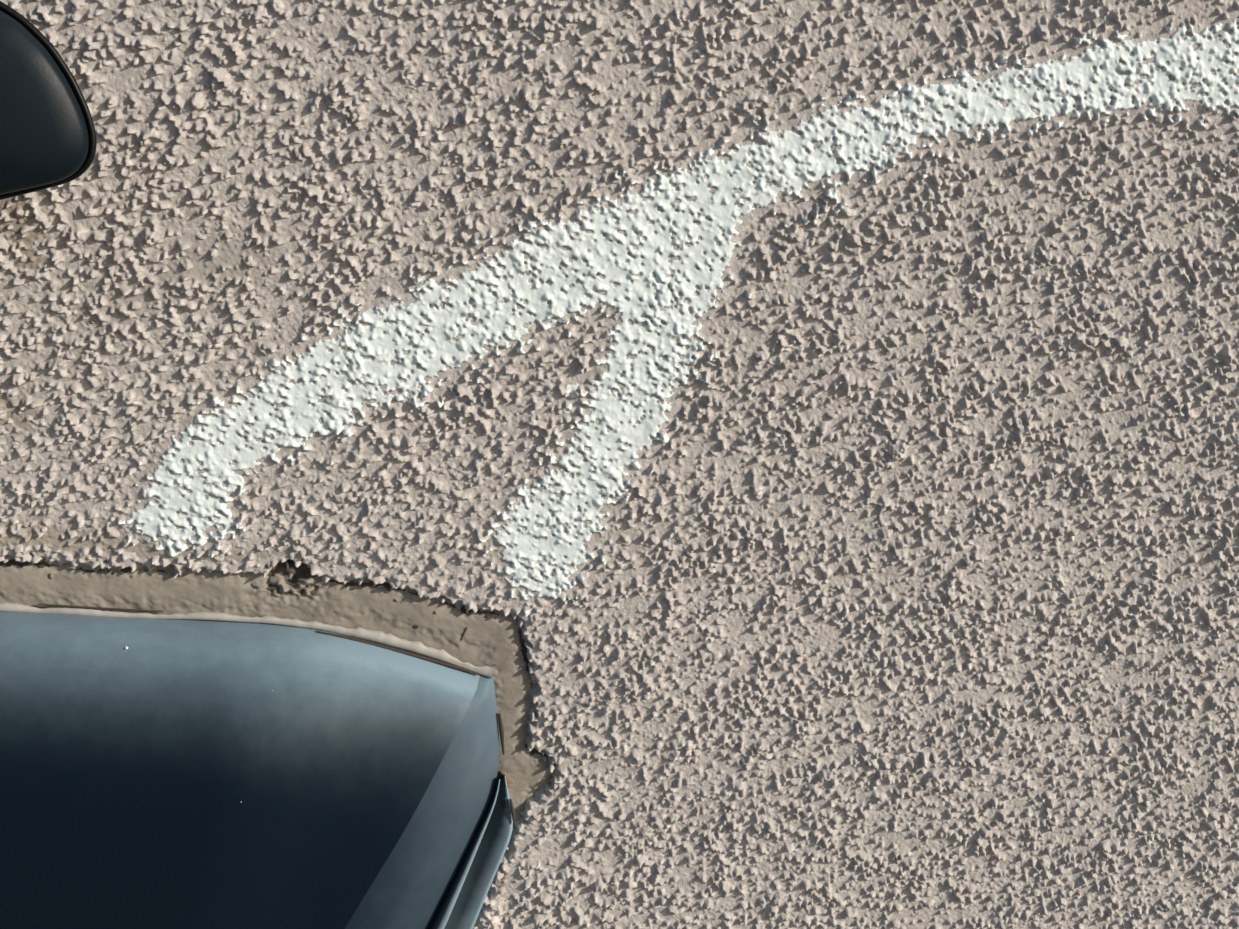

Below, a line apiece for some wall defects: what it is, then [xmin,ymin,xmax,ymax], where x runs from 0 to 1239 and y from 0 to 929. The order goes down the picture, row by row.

peeling [0,558,554,853]